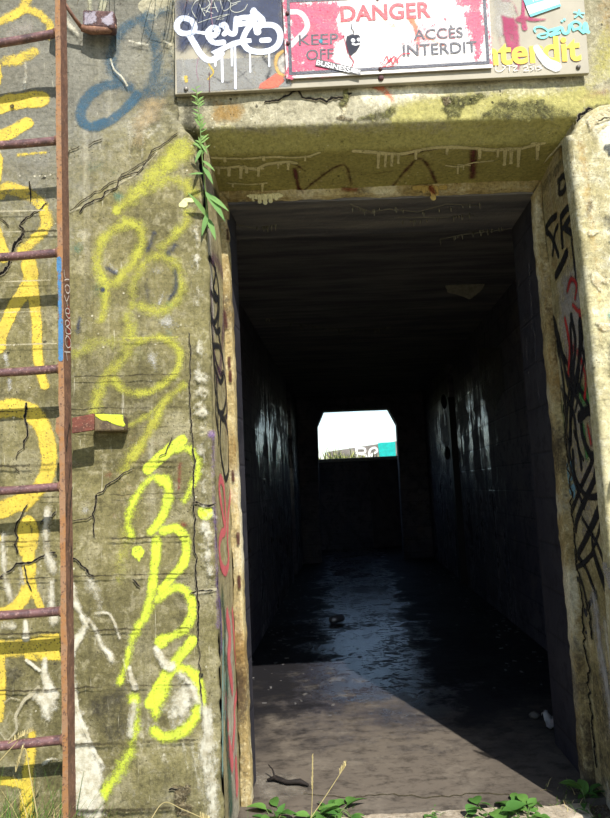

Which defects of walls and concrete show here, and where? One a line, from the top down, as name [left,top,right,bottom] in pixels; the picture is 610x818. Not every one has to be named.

crack [264,90,352,103]
crack [70,133,177,213]
leakage [496,148,521,167]
crack [0,181,47,276]
crack [15,402,29,472]
crack [0,468,134,591]
crack [158,333,216,715]
crack [304,791,510,799]